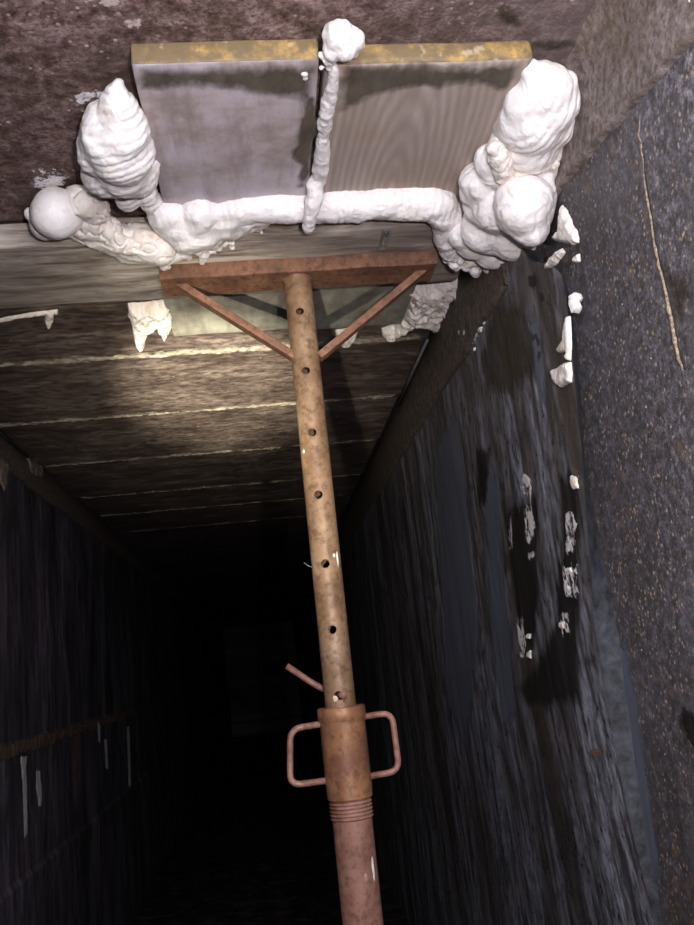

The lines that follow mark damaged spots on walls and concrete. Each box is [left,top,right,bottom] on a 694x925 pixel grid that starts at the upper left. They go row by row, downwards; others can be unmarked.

peeling [0,458,10,491]